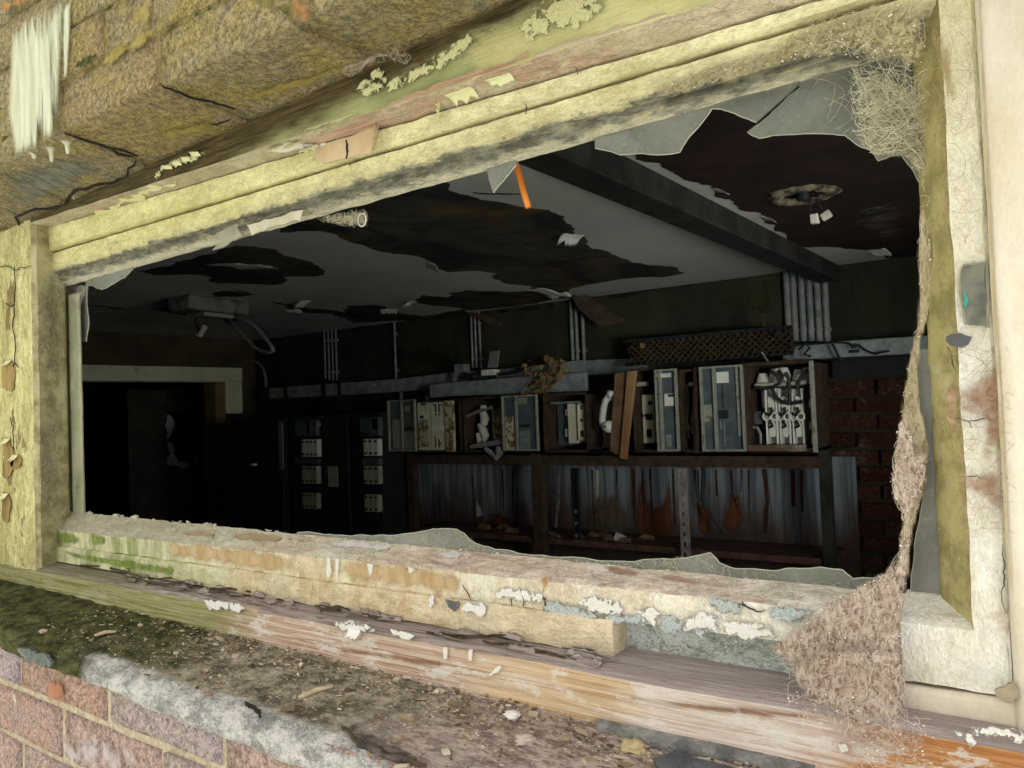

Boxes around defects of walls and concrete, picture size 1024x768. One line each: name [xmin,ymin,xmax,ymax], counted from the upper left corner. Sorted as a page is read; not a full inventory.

damp [8,4,101,216]
crack [162,86,235,126]
peeling [265,0,667,164]
crack [14,133,138,226]
peeling [631,56,920,258]
peeling [140,182,685,323]
peeling [0,437,22,479]
corrosion [590,468,675,536]
peeling [205,600,246,613]
peeling [335,620,375,640]
peeling [390,629,415,640]
peeling [495,587,817,640]